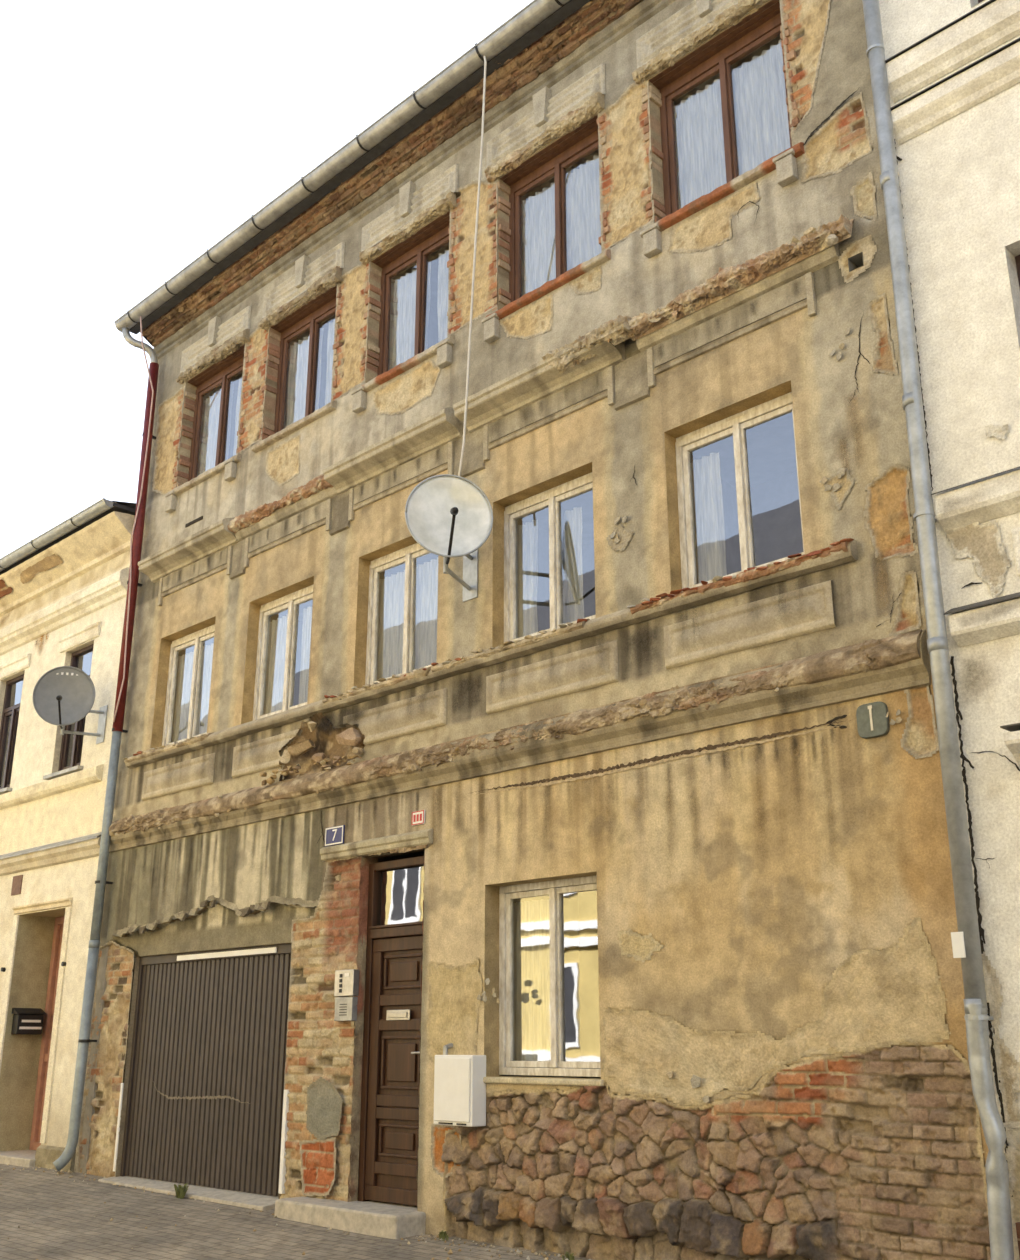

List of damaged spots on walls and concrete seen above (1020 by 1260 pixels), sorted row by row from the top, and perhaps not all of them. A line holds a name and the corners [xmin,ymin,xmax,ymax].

spalling [140,0,877,533]
crack [849,313,870,403]
spalling [109,465,922,836]
peeling [945,520,1012,598]
spalling [75,844,428,1202]
spalling [427,917,991,1260]